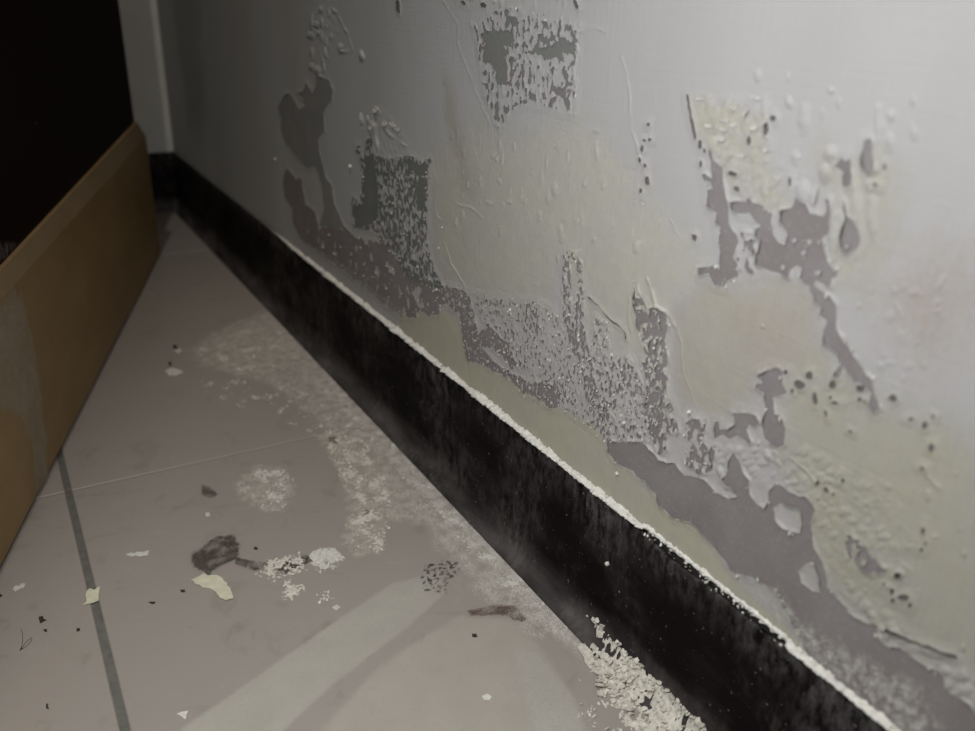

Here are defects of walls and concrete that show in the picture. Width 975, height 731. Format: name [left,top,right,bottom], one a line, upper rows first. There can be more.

peeling [457,0,585,134]
peeling [276,73,975,731]
damp [302,71,975,731]